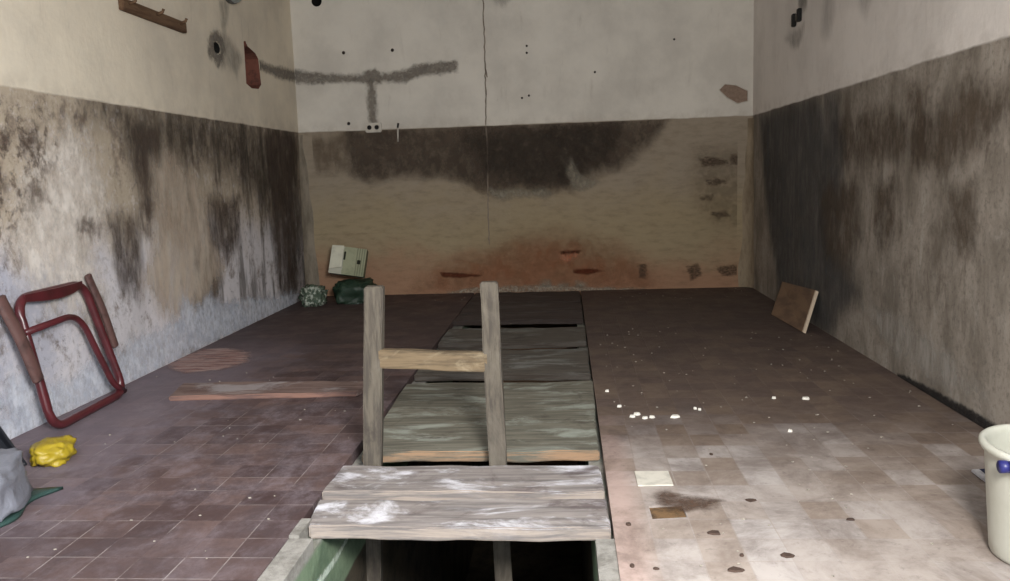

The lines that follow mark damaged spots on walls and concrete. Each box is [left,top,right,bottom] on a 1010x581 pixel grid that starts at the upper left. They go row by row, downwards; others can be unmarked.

water stain [0,103,304,439]
water stain [346,119,663,198]
peeling [719,84,748,104]
water stain [761,85,1002,329]